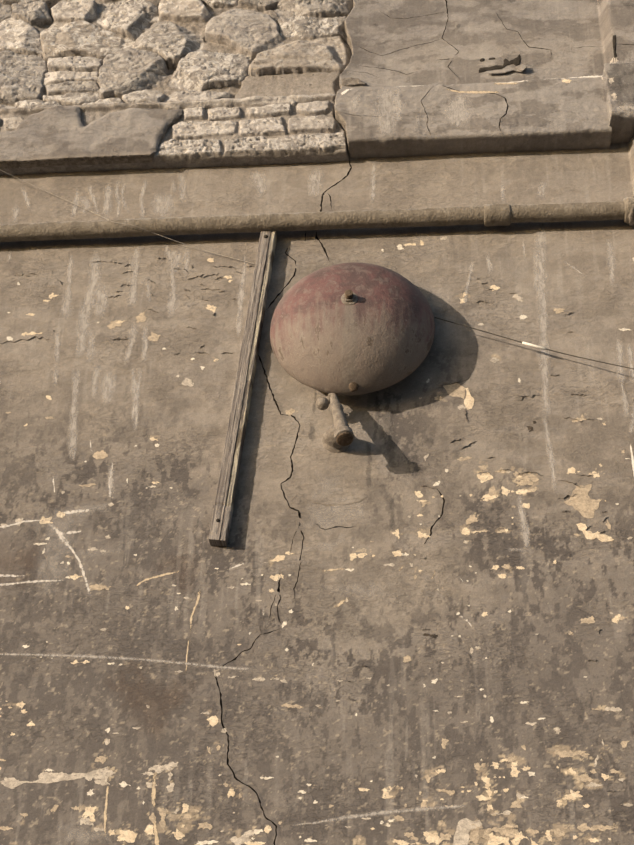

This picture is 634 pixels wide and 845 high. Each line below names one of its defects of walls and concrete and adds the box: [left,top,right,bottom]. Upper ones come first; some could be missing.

crack [340,0,512,136]
crack [493,11,634,58]
crack [265,160,355,311]
crack [421,486,448,547]
peeling [460,465,539,533]
peeling [564,463,614,542]
crack [210,349,356,845]
peeling [0,756,178,796]
peeling [70,803,224,843]
peeling [230,821,282,845]
peeling [393,756,617,845]
peeling [554,749,624,808]